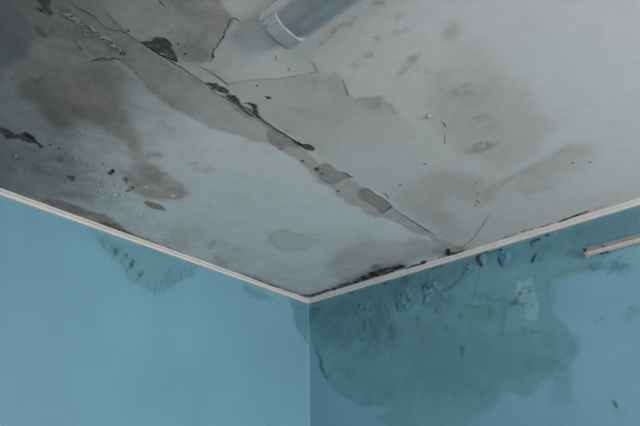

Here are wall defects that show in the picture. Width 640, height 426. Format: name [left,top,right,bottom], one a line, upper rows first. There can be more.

spalling [0,126,52,149]
peeling [140,0,261,118]
crack [107,12,304,147]
water stain [7,0,604,297]
water stain [290,205,640,426]